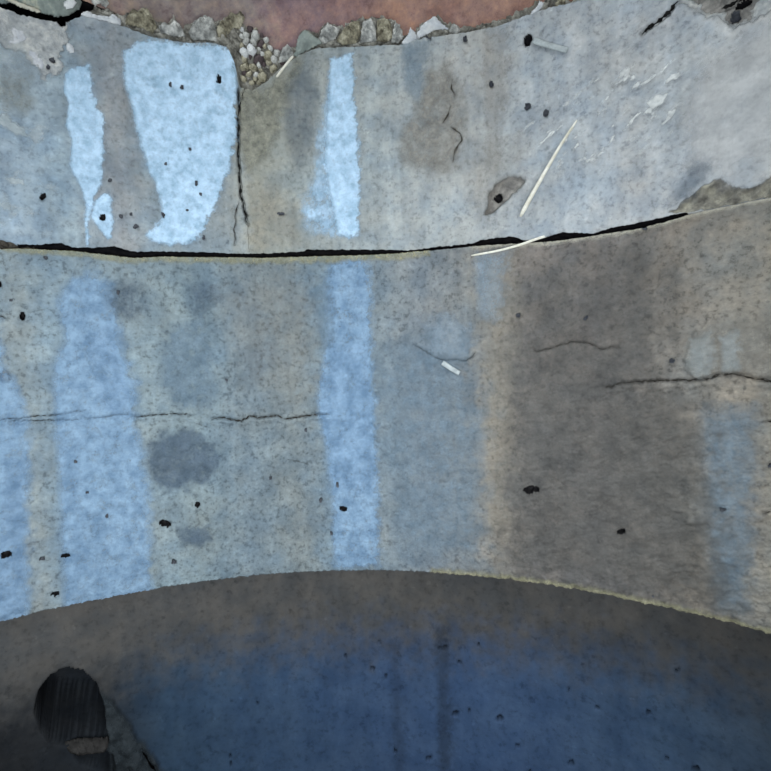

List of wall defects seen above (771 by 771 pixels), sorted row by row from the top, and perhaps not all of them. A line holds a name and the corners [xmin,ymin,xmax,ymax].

spalling [0,7,69,79]
efflorescence [64,64,114,245]
efflorescence [123,39,238,246]
spalling [81,0,580,164]
efflorescence [303,53,361,239]
crack [17,79,688,258]
spalling [669,177,771,213]
spalling [679,0,771,29]
damp [56,276,217,606]
crack [100,413,327,427]
efflorescence [319,260,379,567]
crack [605,373,771,388]